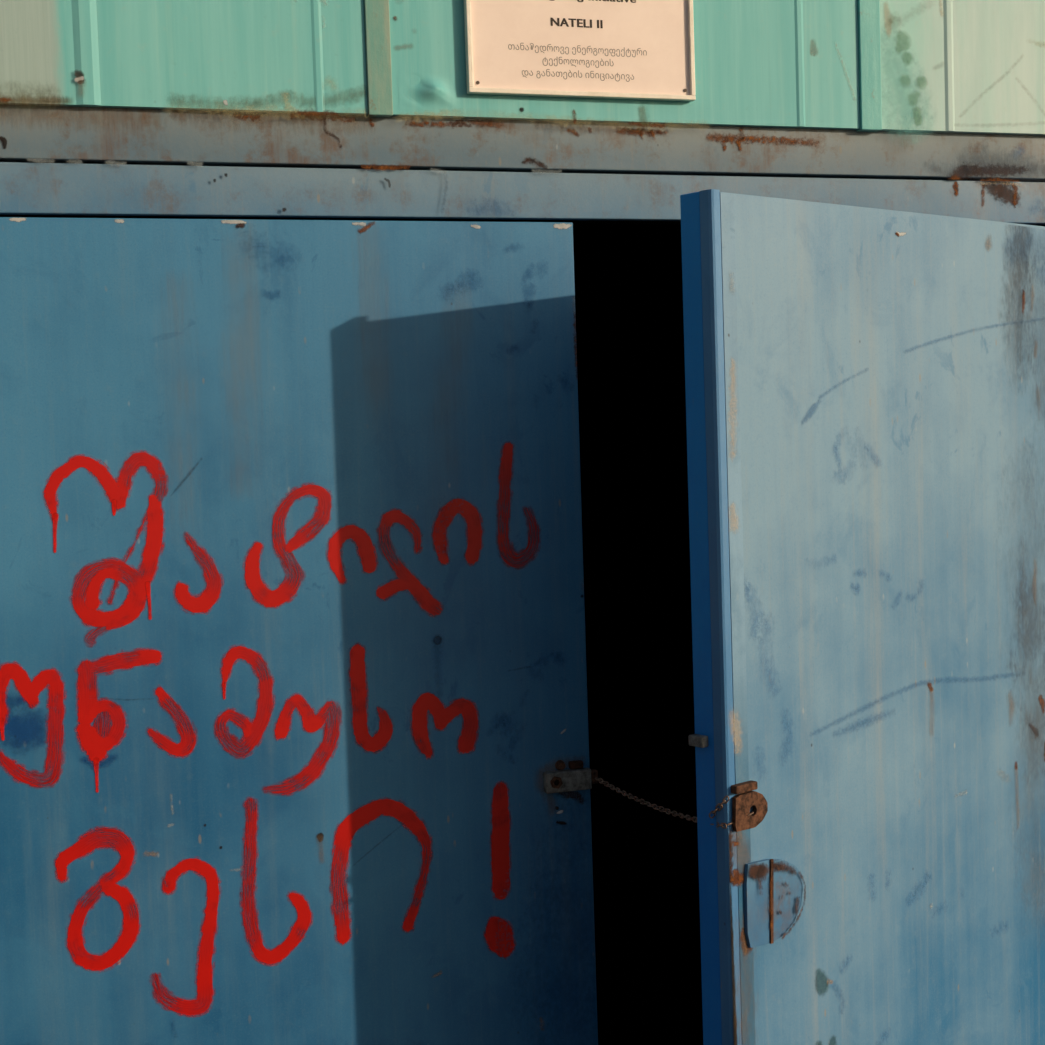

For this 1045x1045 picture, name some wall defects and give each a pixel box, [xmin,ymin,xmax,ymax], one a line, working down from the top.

corrosion [947,164,1028,207]
corrosion [729,834,806,1045]